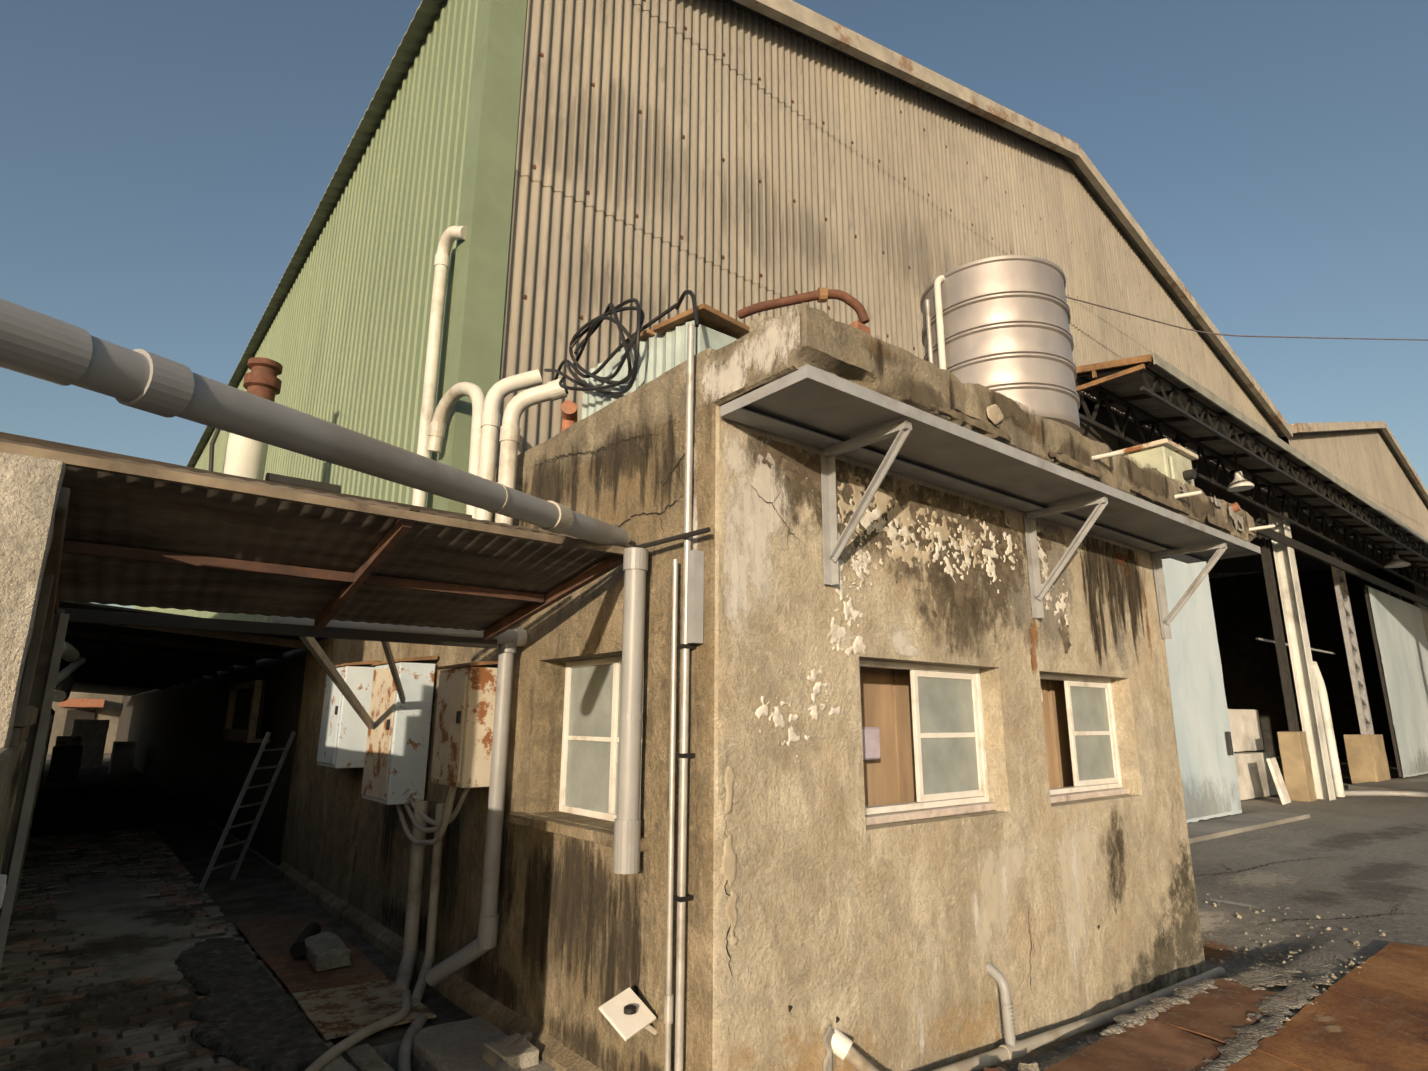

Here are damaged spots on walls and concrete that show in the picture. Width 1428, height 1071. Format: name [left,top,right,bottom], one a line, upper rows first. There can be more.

spalling [744,436,1072,658]
corrosion [1029,618,1038,671]
leakage [1080,536,1151,664]
peeling [755,663,841,762]
crack [724,880,737,981]